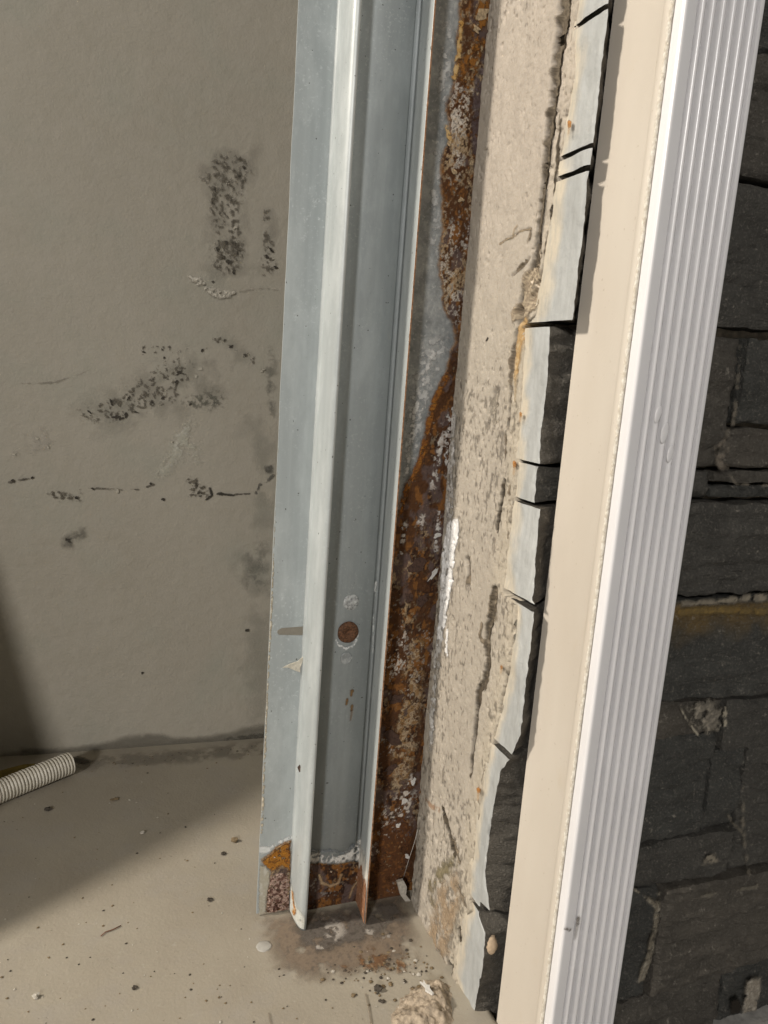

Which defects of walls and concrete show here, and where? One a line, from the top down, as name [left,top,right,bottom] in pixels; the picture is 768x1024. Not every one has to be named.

mould [203,155,247,274]
mould [262,232,278,271]
mould [83,346,203,421]
rust [259,0,490,975]